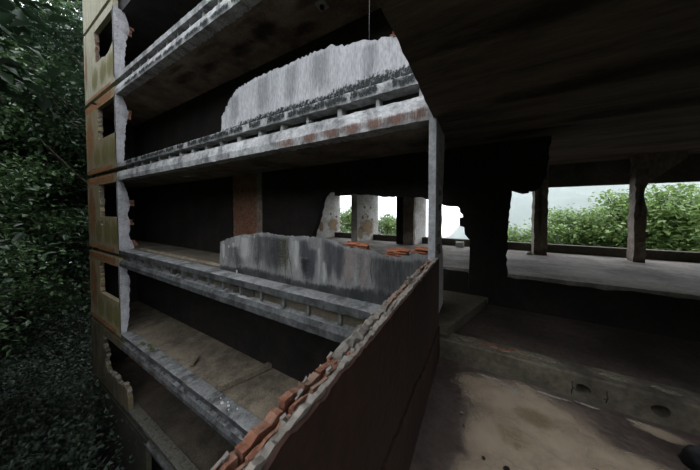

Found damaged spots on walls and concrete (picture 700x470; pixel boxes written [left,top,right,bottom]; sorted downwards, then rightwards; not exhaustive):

leakage [126,65,416,164]
rust [304,107,425,142]
leakage [220,237,424,305]
spalling [385,246,431,303]
spalling [103,336,133,393]